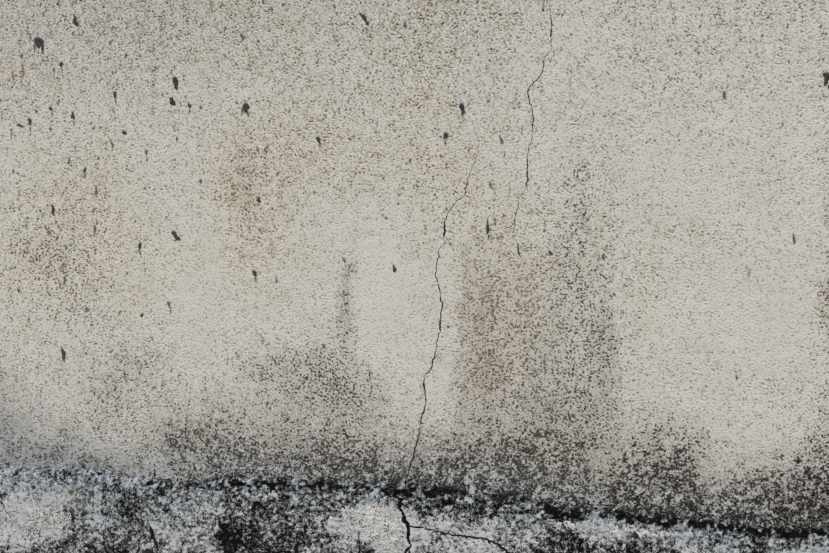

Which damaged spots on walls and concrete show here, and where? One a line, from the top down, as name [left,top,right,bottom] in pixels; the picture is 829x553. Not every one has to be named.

crack [513,1,552,258]
damp [0,416,134,481]
damp [89,357,153,421]
crack [393,145,510,553]
damp [142,223,829,539]